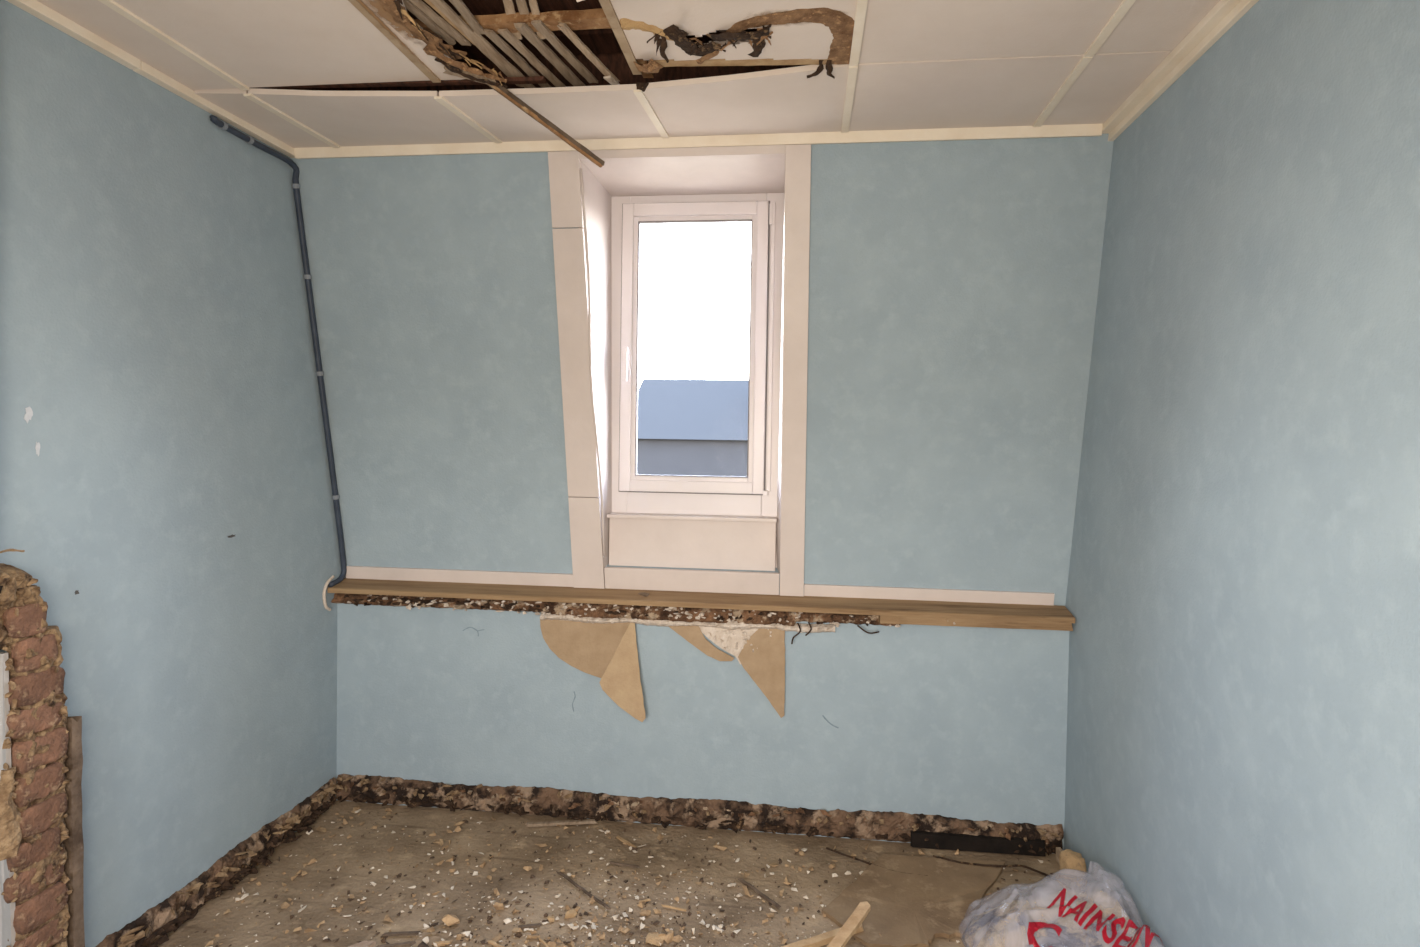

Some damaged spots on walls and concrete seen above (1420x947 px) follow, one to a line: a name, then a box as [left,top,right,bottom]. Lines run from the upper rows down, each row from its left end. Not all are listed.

peeling [393,0,506,85]
peeling [647,24,773,64]
peeling [807,60,835,79]
spalling [322,575,1073,652]
flaking render [0,549,72,947]